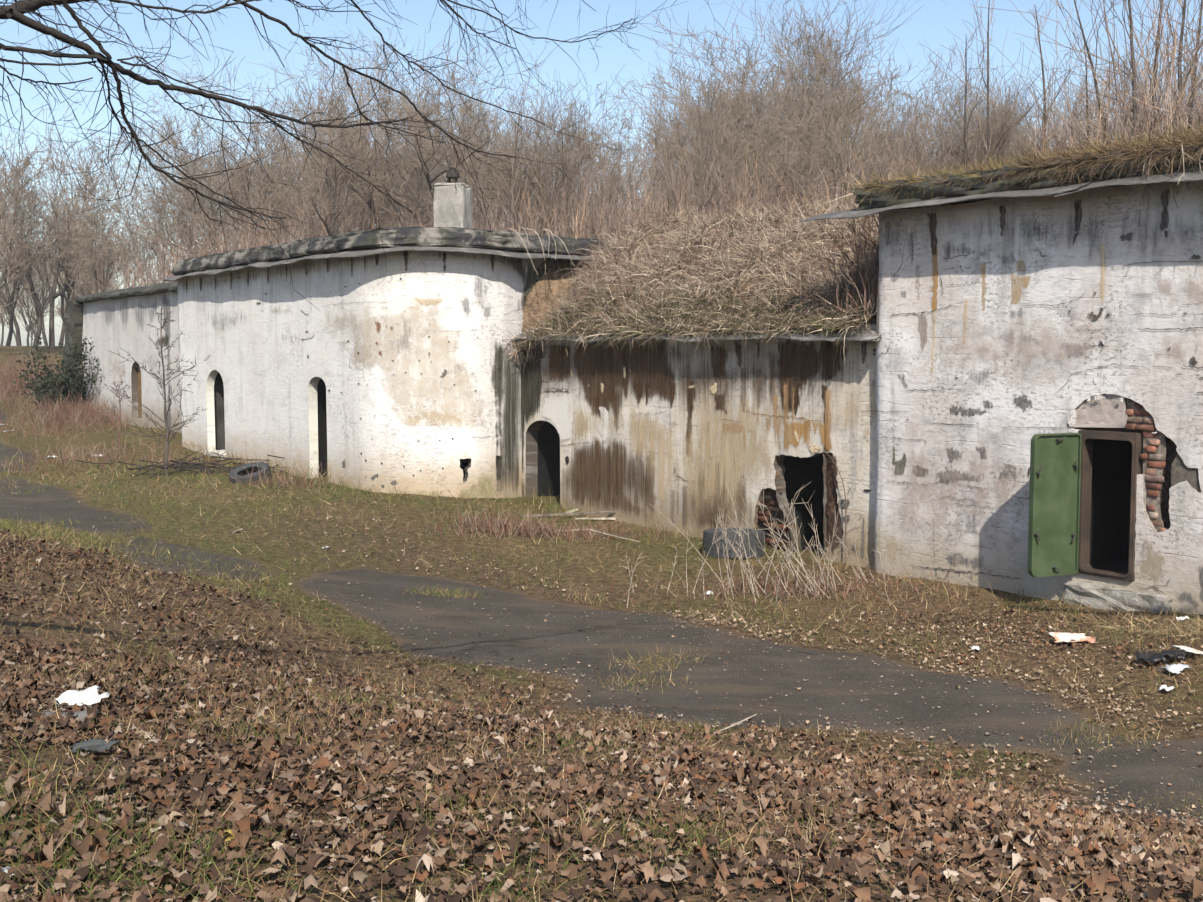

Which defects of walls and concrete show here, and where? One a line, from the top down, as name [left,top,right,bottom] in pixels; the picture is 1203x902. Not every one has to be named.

damp [337,298,481,423]
crack [876,254,973,357]
crack [1058,294,1203,393]
crack [1091,260,1203,268]
damp [462,341,867,513]
damp [672,465,746,528]
flaking render [754,455,795,551]
flaking render [794,430,850,559]
corrosion [829,515,844,552]
crack [844,388,1067,446]
flaking render [1067,393,1201,533]